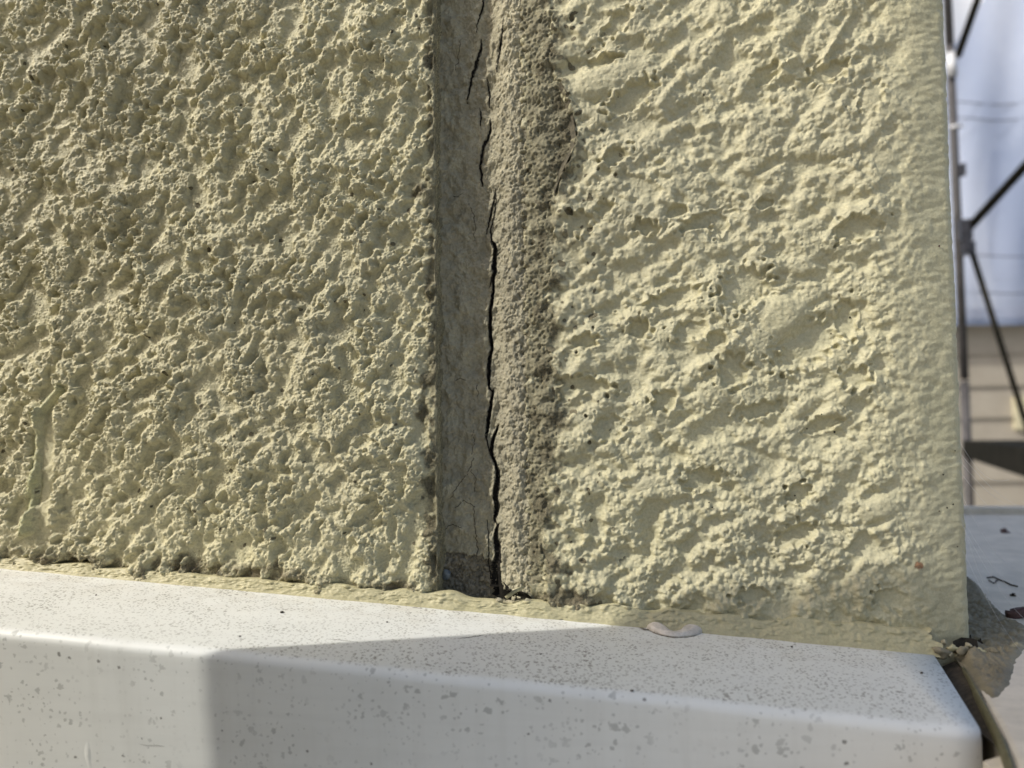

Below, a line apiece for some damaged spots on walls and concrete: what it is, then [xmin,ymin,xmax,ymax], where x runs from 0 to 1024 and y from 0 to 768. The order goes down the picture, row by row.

crack [445,0,504,598]
spalling [932,635,1000,660]